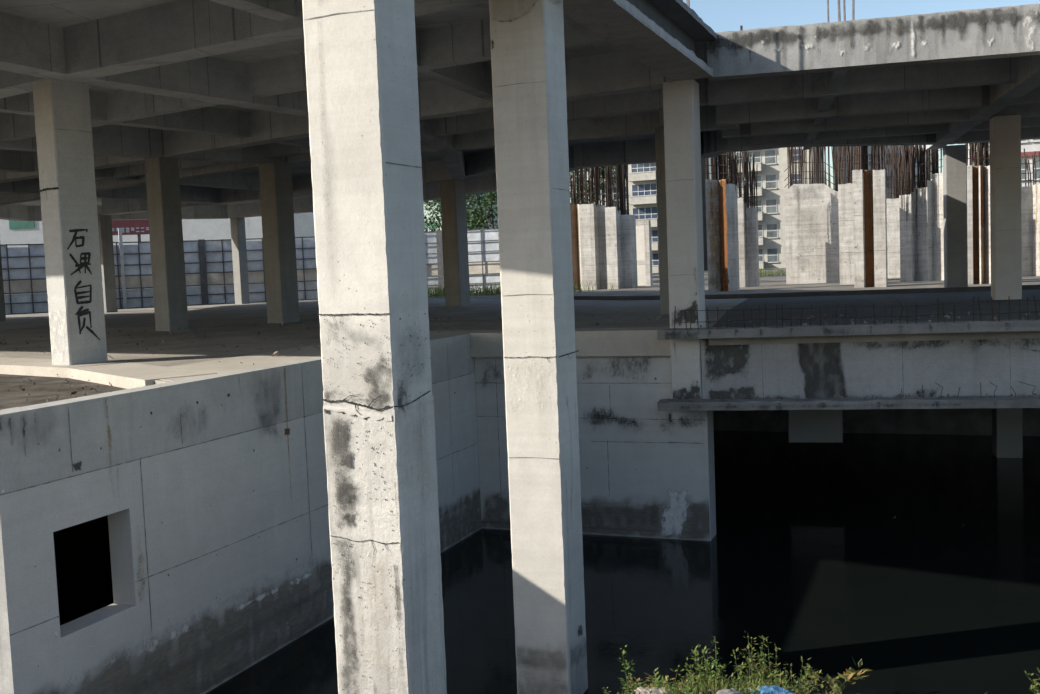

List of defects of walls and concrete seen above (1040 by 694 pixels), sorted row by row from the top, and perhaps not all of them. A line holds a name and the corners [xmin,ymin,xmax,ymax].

water stain [707,7,1040,57]
corrosion [708,181,729,291]
corrosion [864,170,874,287]
crack [322,390,431,419]
water stain [590,409,637,426]
water stain [665,293,785,427]
water stain [799,327,853,407]
water stain [330,416,397,531]
water stain [439,491,511,552]
water stain [581,500,710,539]
water stain [69,541,376,694]